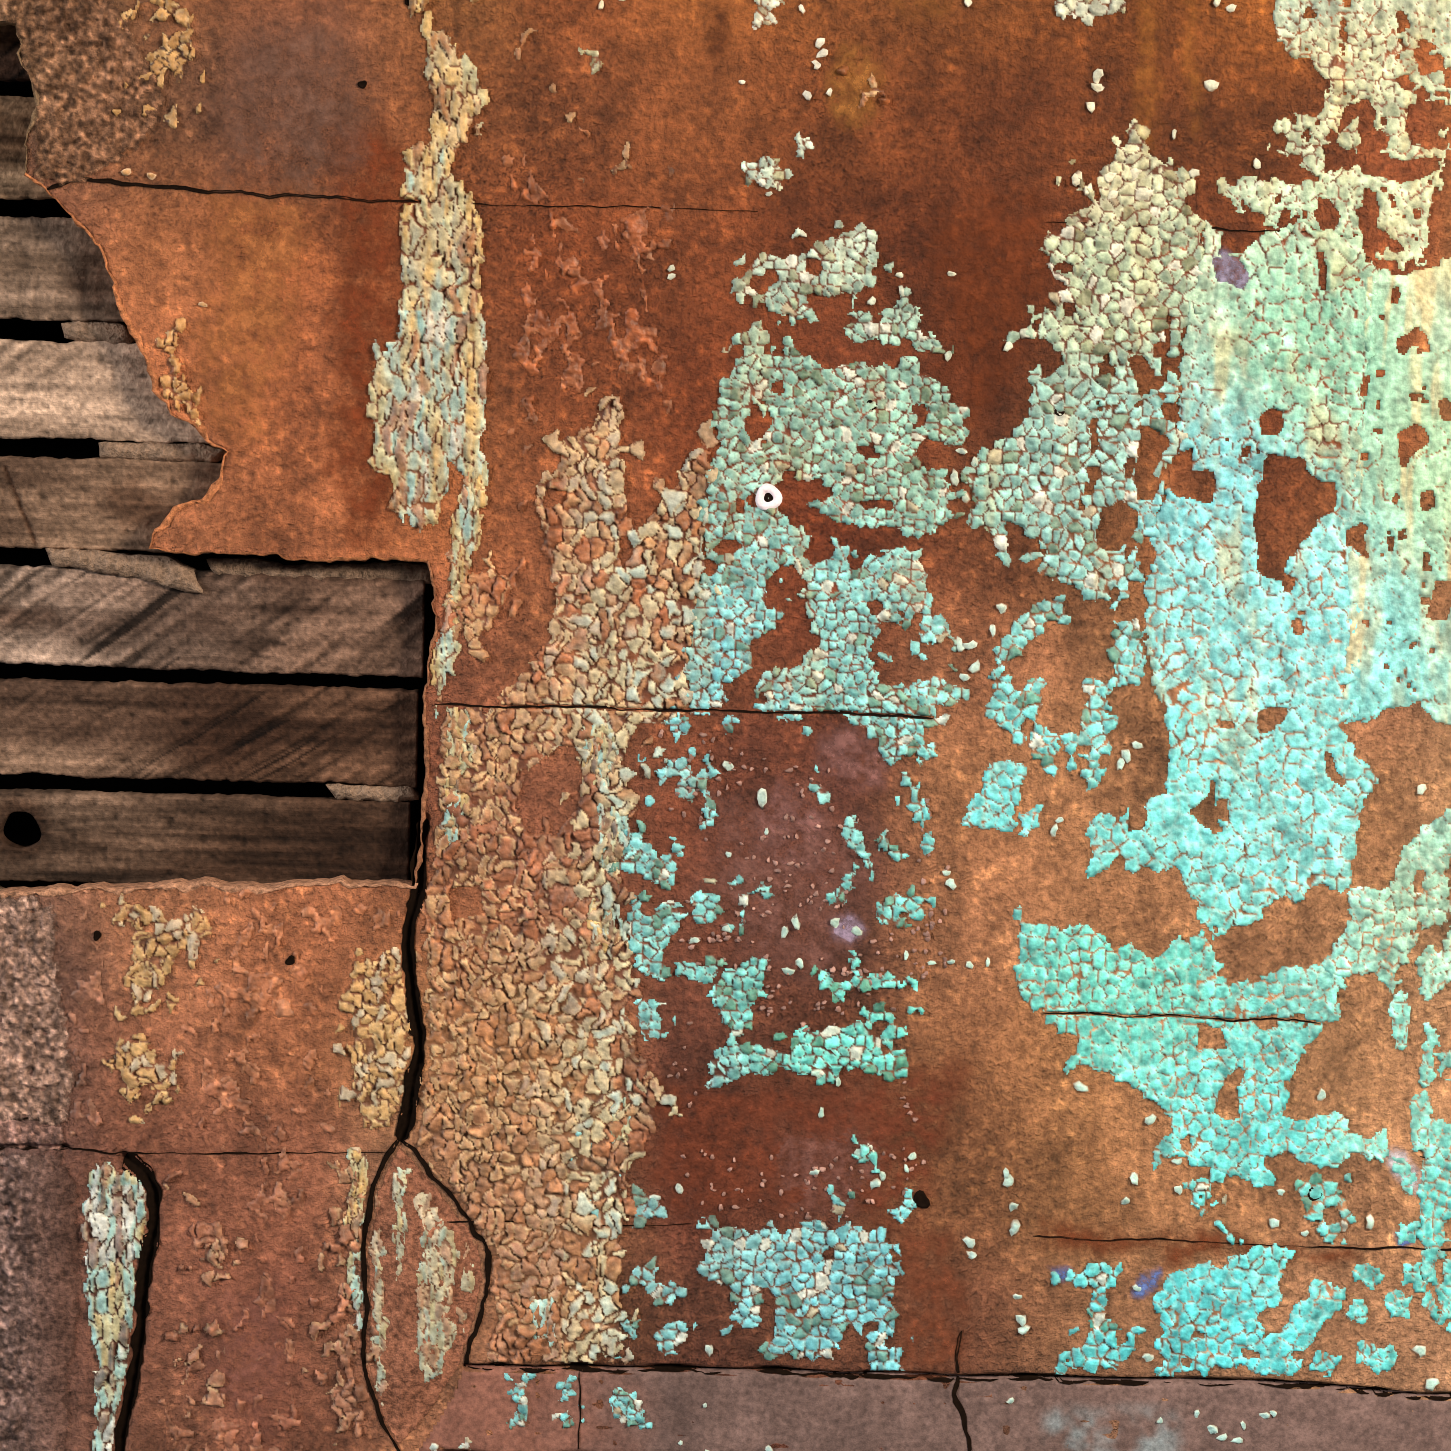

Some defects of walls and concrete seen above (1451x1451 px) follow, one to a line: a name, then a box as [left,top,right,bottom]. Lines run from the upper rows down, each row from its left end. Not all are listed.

corrosion [208,203,298,432]
corrosion [328,131,404,541]
peeling [416,0,1451,1377]
crack [0,818,1451,1451]
corrosion [1055,1226,1221,1266]
peeling [504,1373,537,1430]
peeling [552,1374,585,1429]
peeling [609,1387,652,1430]
peeling [1194,1409,1277,1444]
peeling [1425,1378,1440,1391]